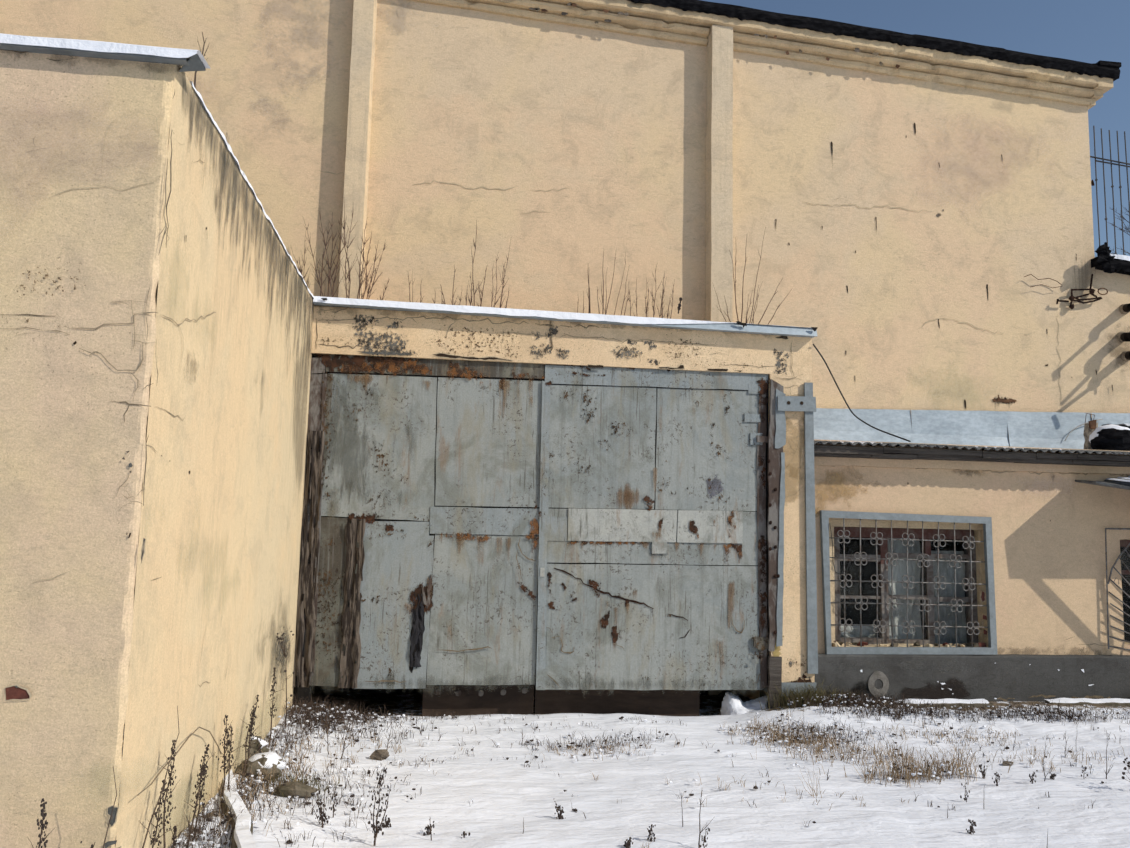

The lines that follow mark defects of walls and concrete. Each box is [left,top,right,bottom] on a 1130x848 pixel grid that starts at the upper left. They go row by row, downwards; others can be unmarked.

crack [51,92,208,253]
water stain [183,82,314,357]
crack [0,268,239,422]
peeling [320,314,418,357]
corrosion [315,353,433,388]
peeling [431,325,569,361]
peeling [612,333,791,375]
corrosion [569,468,663,547]
corrosion [689,511,743,562]
crack [513,528,690,638]
corrosion [589,579,637,646]
flaking render [5,683,32,701]